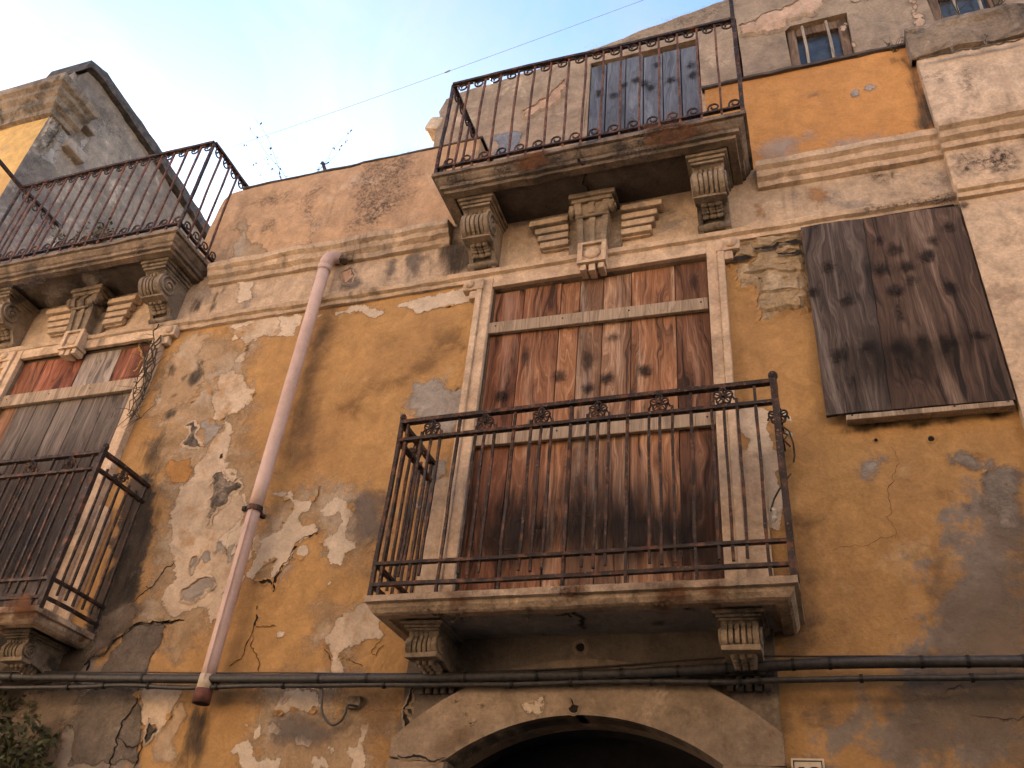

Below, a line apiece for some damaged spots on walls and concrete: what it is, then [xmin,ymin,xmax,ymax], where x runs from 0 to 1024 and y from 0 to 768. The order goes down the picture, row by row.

damp [355,157,409,223]
peeling [317,288,470,318]
spalling [727,232,812,326]
peeling [404,375,462,433]
peeling [0,313,303,768]
peeling [237,482,387,598]
crack [834,446,900,549]
crack [84,563,184,671]
crack [230,532,318,672]
peeling [307,597,386,673]
crack [109,689,153,768]
peeling [231,688,399,768]